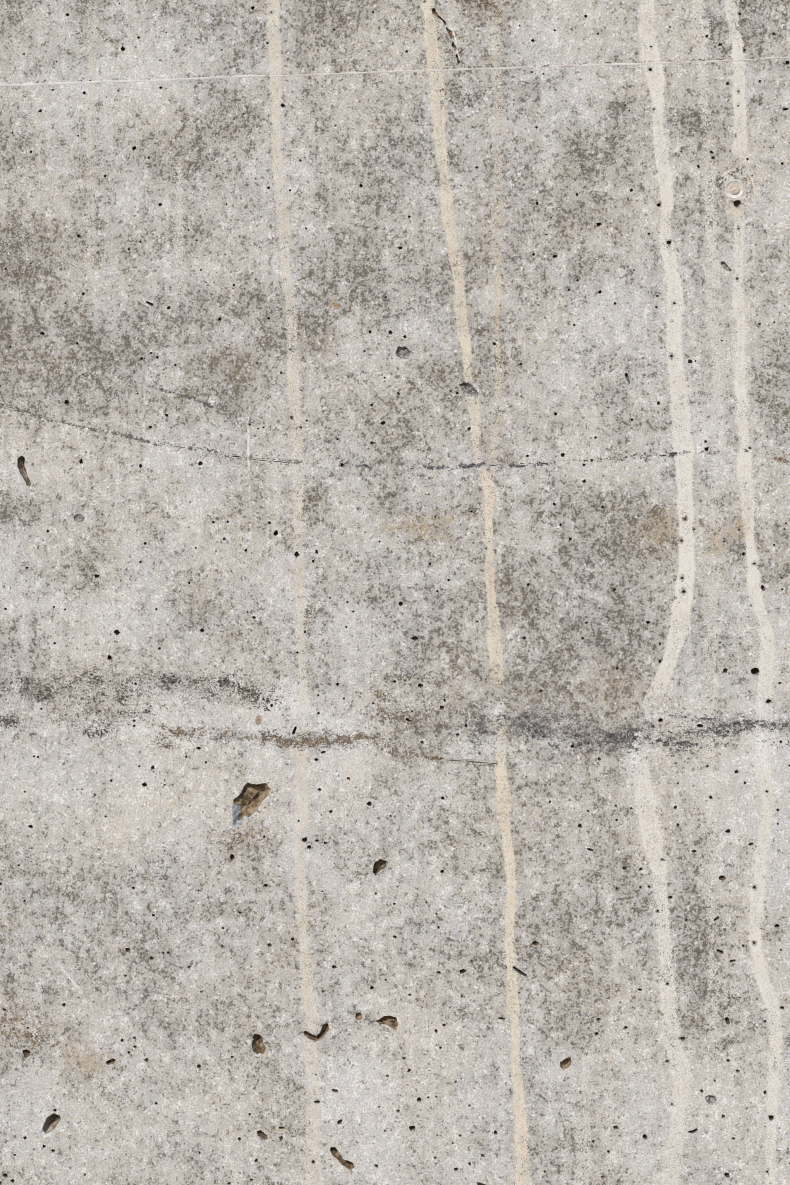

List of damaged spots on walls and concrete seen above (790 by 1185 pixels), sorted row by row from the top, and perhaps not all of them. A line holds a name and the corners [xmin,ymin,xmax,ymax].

damp [0,0,445,1185]
damp [353,0,790,1185]